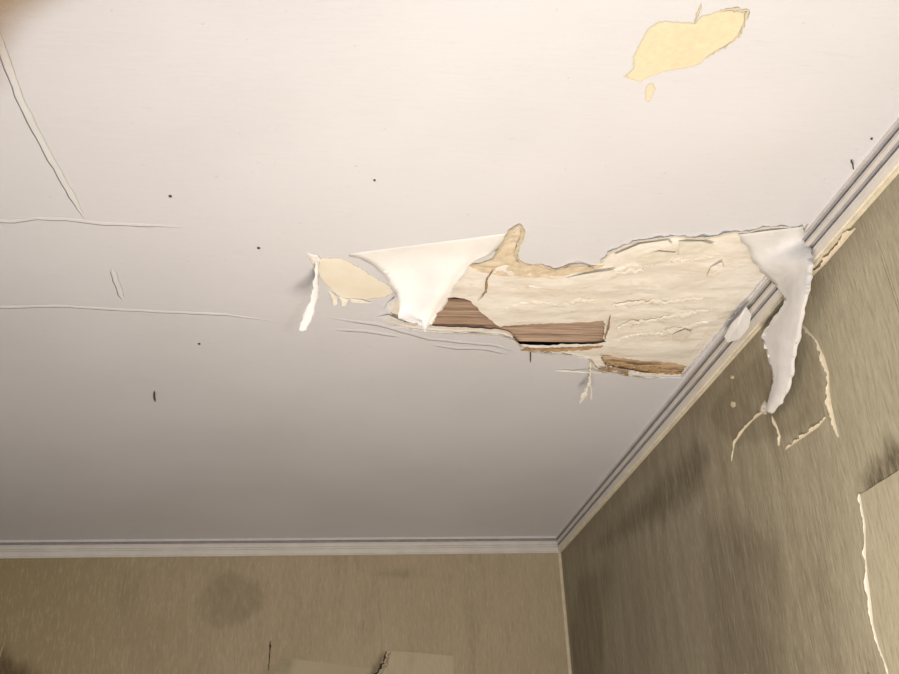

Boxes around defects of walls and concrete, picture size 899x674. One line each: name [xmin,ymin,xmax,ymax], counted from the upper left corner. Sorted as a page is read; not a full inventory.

flaking render [298,224,815,415]